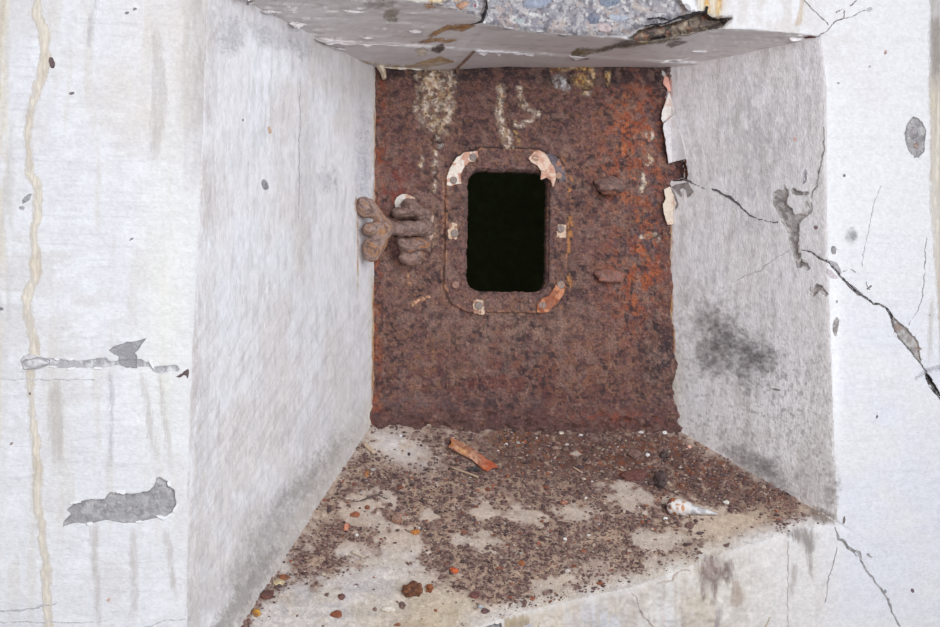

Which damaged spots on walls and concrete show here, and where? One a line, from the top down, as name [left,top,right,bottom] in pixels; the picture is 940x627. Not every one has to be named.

spalling [436,0,732,44]
damp [21,0,51,356]
crack [686,179,778,223]
spalling [773,169,813,270]
spalling [905,116,926,159]
damp [929,0,940,346]
crack [736,187,940,399]
spalling [47,338,189,378]
damp [27,370,54,627]
spalling [63,477,179,526]
crack [825,527,901,627]